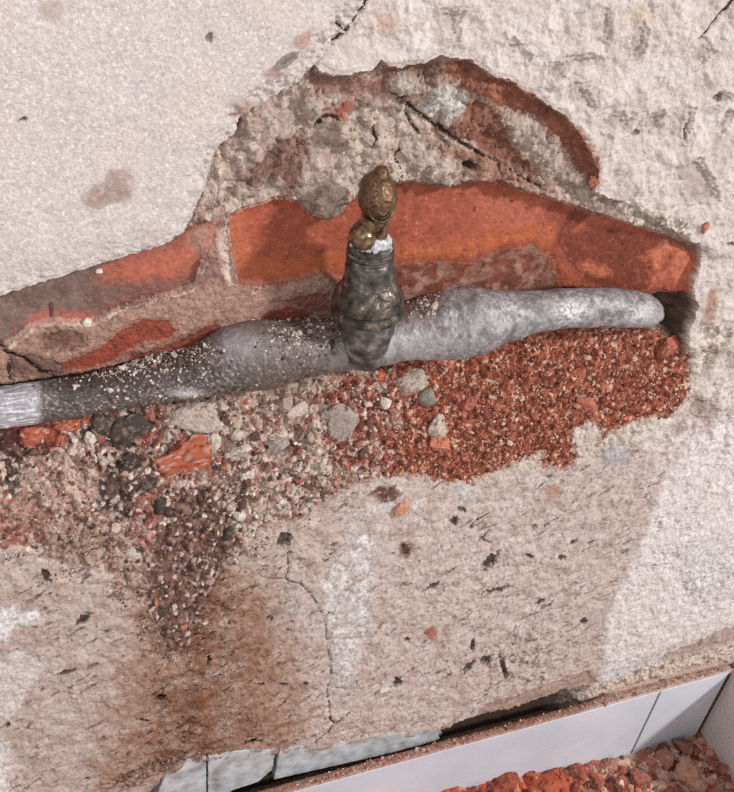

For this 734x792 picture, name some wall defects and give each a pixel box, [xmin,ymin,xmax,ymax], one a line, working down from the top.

crack [331,0,367,40]
crack [389,91,546,190]
flaking render [0,55,703,666]
crack [262,552,354,744]